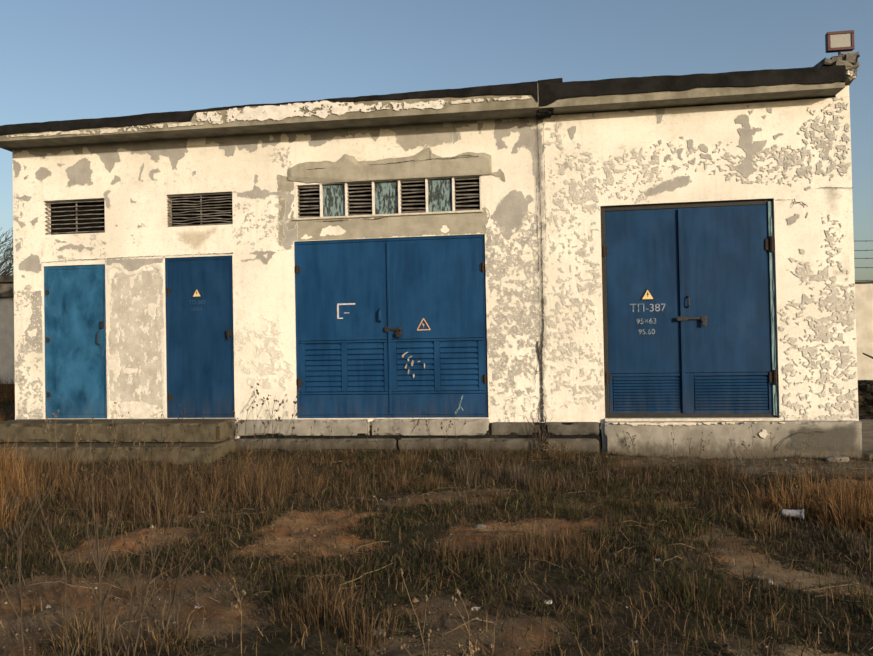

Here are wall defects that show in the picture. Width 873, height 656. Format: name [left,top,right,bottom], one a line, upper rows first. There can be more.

spalling [814,51,860,85]
peeling [7,96,531,420]
peeling [172,97,859,438]
crack [535,119,546,422]